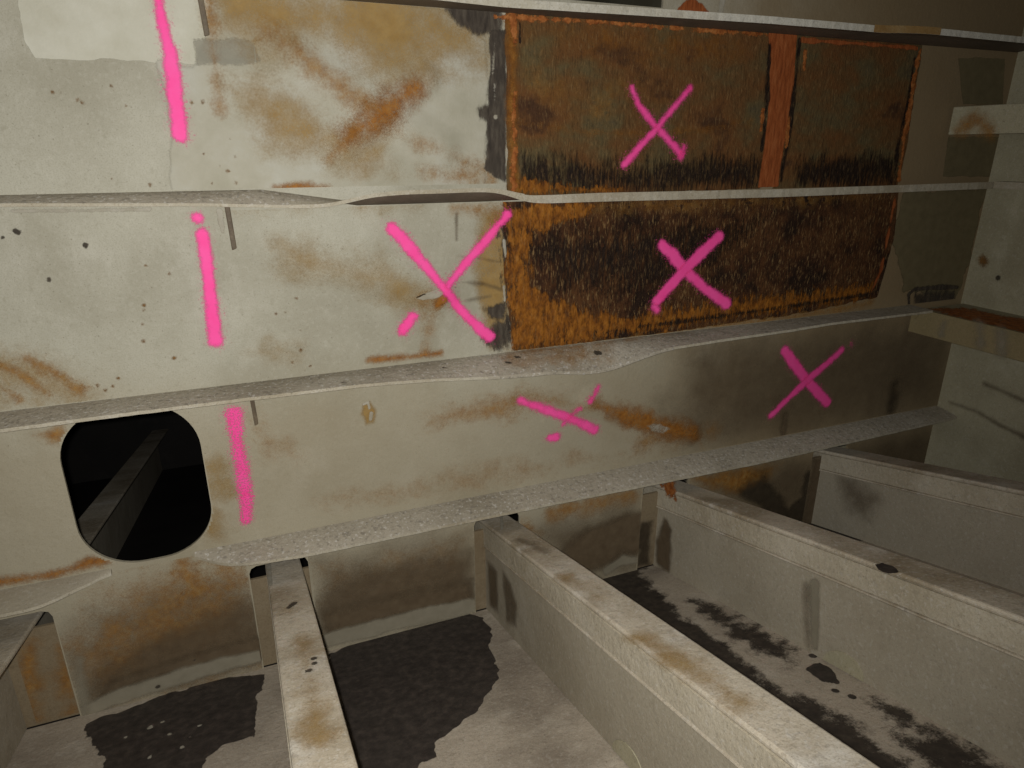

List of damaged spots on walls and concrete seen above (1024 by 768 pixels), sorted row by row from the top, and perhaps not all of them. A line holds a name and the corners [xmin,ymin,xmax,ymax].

corrosion [252,50,423,160]
corrosion [494,13,922,359]
corrosion [593,403,698,440]
damp [79,598,264,768]
damp [321,558,499,768]
damp [558,513,997,768]